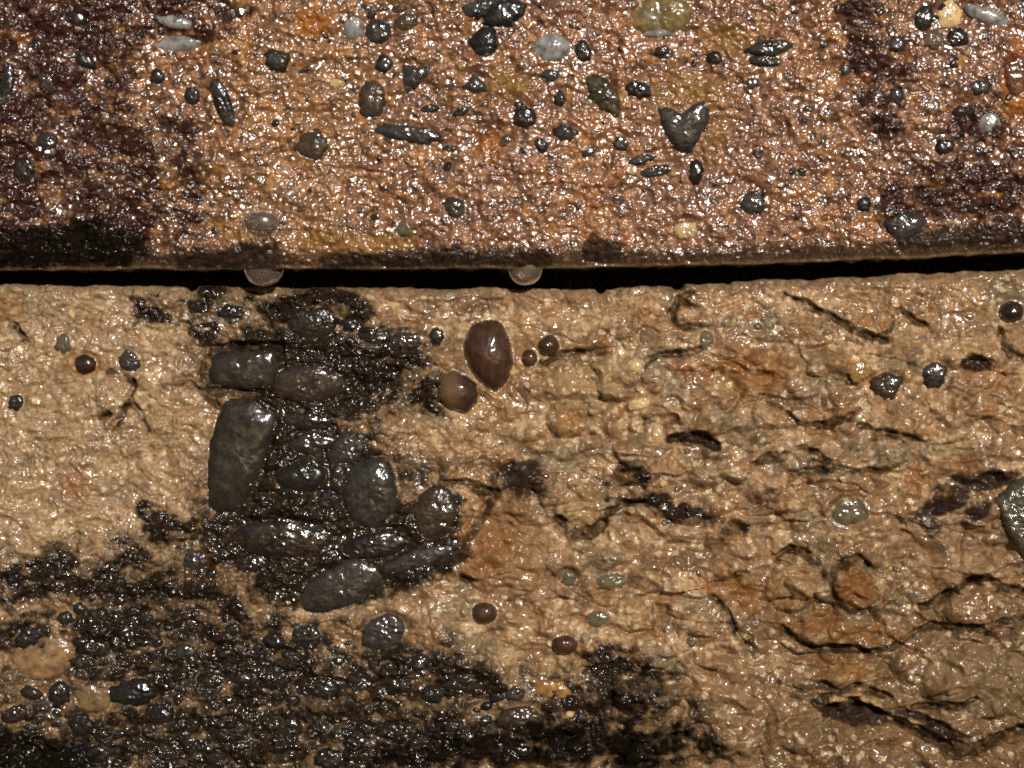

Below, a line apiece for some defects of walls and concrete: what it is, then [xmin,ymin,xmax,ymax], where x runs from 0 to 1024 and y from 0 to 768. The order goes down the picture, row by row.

leakage [0,0,254,269]
crack [645,290,702,367]
crack [783,296,926,344]
crack [998,326,1017,361]
crack [755,408,924,475]
leakage [0,285,750,768]
crack [775,545,879,615]
crack [709,597,752,646]
crack [780,575,1024,655]
crack [777,680,885,699]
crack [901,699,1024,757]